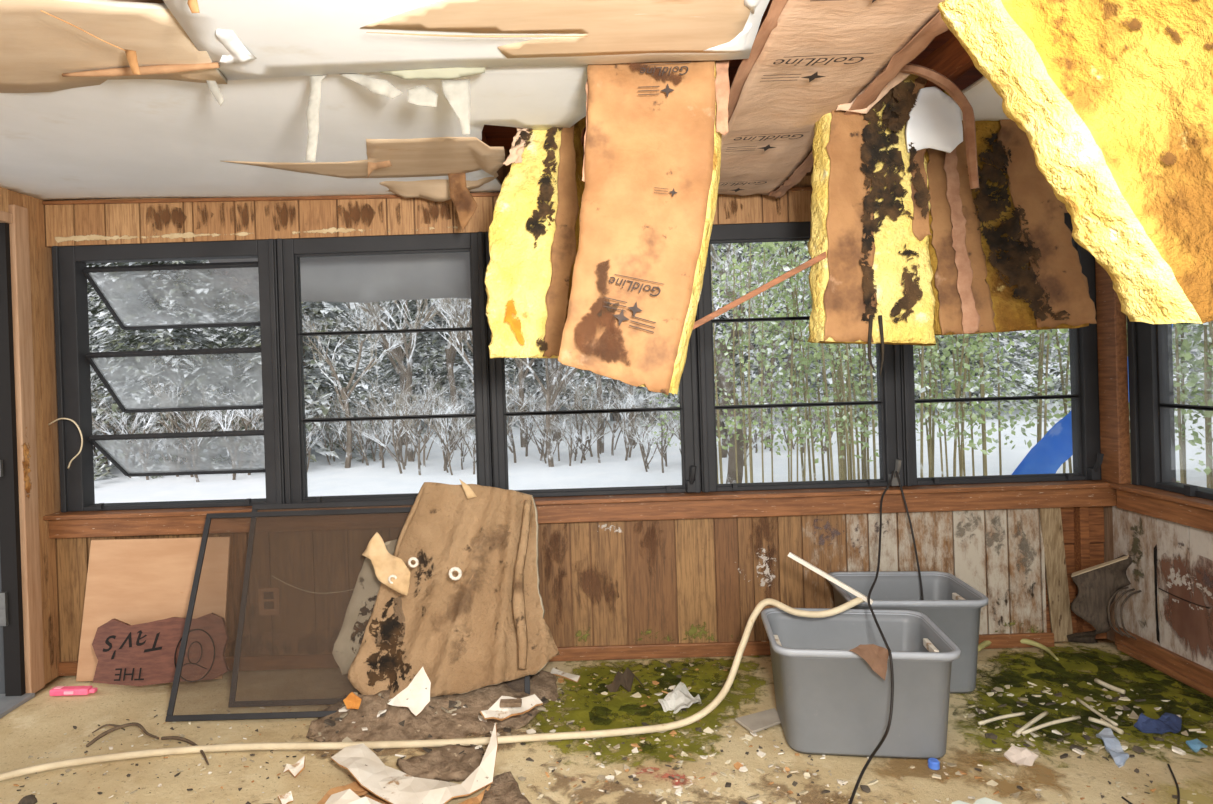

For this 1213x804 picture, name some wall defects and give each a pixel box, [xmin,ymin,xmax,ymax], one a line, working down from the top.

leakage [55,201,401,243]
leakage [417,201,458,231]
leakage [542,528,620,623]
leakage [637,522,657,567]
leakage [750,517,776,599]